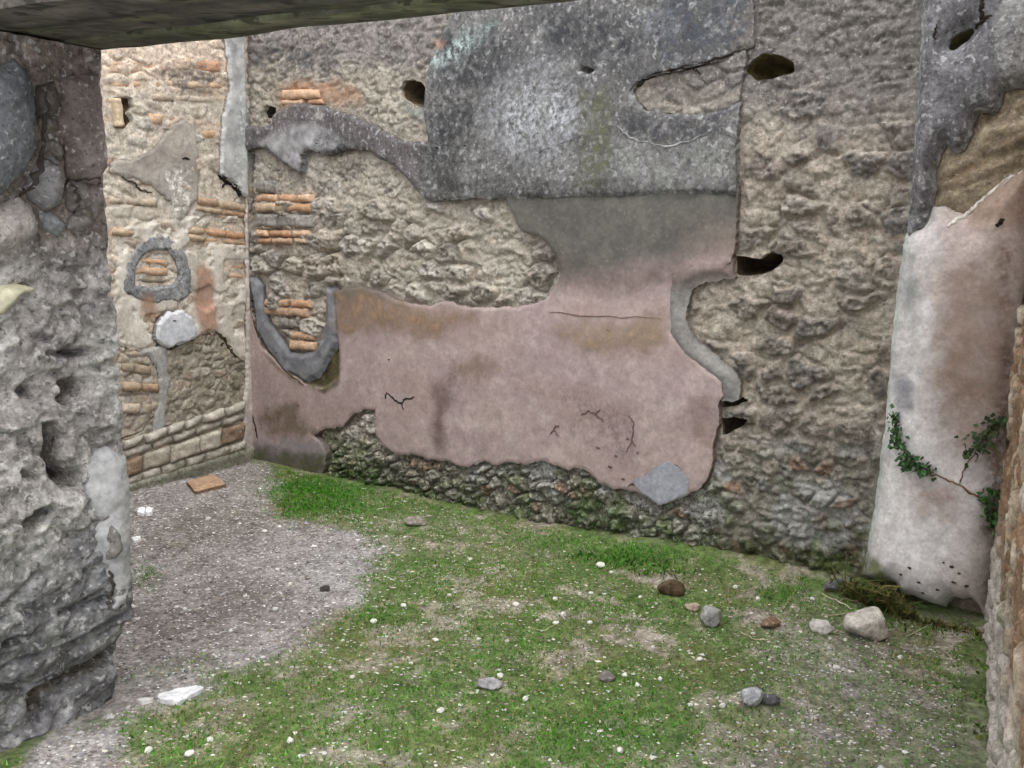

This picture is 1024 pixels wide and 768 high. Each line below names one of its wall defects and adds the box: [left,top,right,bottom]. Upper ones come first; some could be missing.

spalling [950,29,974,51]
spalling [109,59,227,129]
spalling [246,13,453,149]
crack [18,91,152,214]
crack [217,175,242,197]
spalling [934,89,1024,227]
spalling [188,149,560,353]
crack [560,311,650,319]
spalling [322,0,922,587]
crack [385,392,415,410]
crack [550,410,604,437]
crack [627,417,636,452]